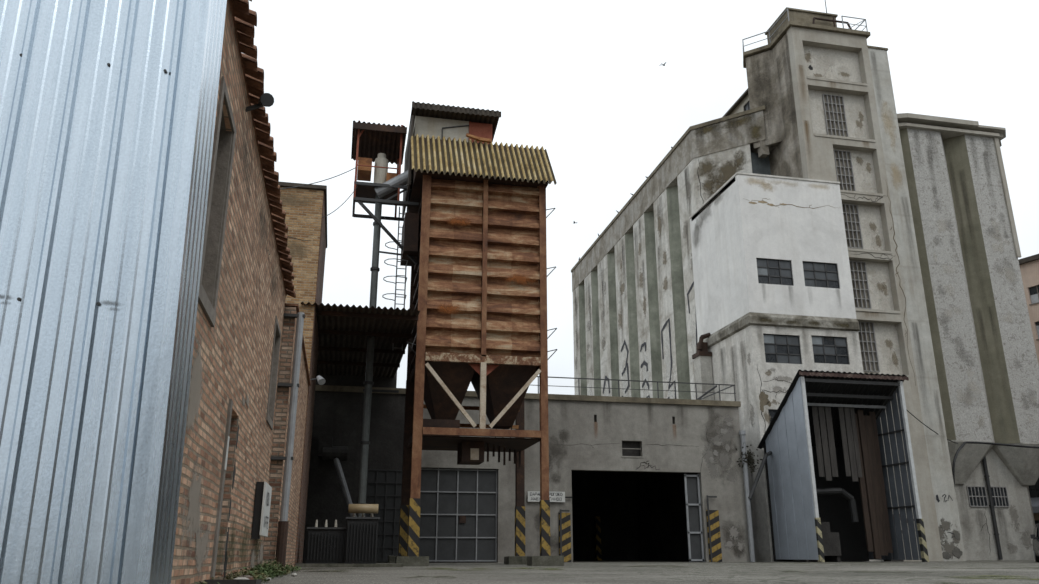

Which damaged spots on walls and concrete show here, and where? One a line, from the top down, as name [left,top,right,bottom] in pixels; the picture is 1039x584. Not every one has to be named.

leakage [699,153,744,196]
crack [746,183,916,386]
spalling [938,519,963,559]